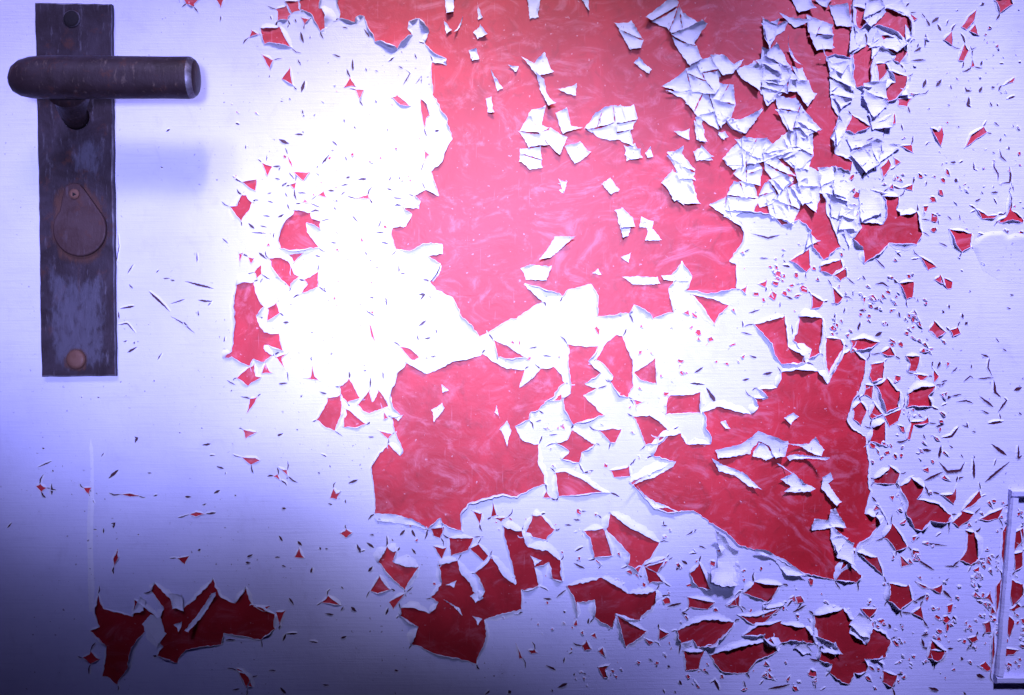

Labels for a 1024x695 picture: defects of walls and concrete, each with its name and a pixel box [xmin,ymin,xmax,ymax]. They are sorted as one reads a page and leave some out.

peeling [77,578,286,691]
peeling [221,0,1024,695]